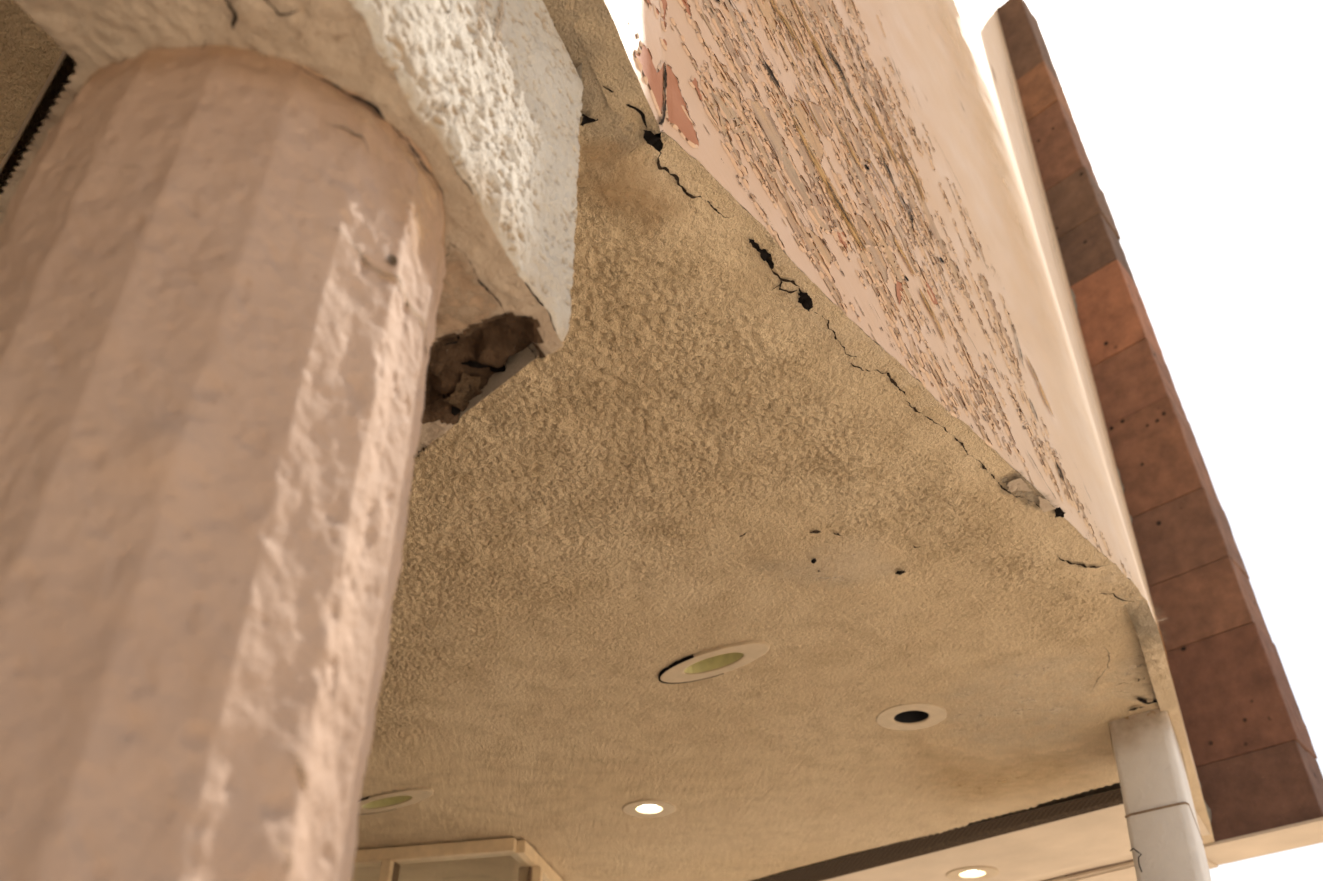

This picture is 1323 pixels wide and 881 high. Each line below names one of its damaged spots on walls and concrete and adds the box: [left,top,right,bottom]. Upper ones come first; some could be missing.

crack [201,0,298,49]
crack [294,65,508,316]
spalling [421,312,546,425]
peeling [630,0,1127,578]
crack [580,0,1183,713]